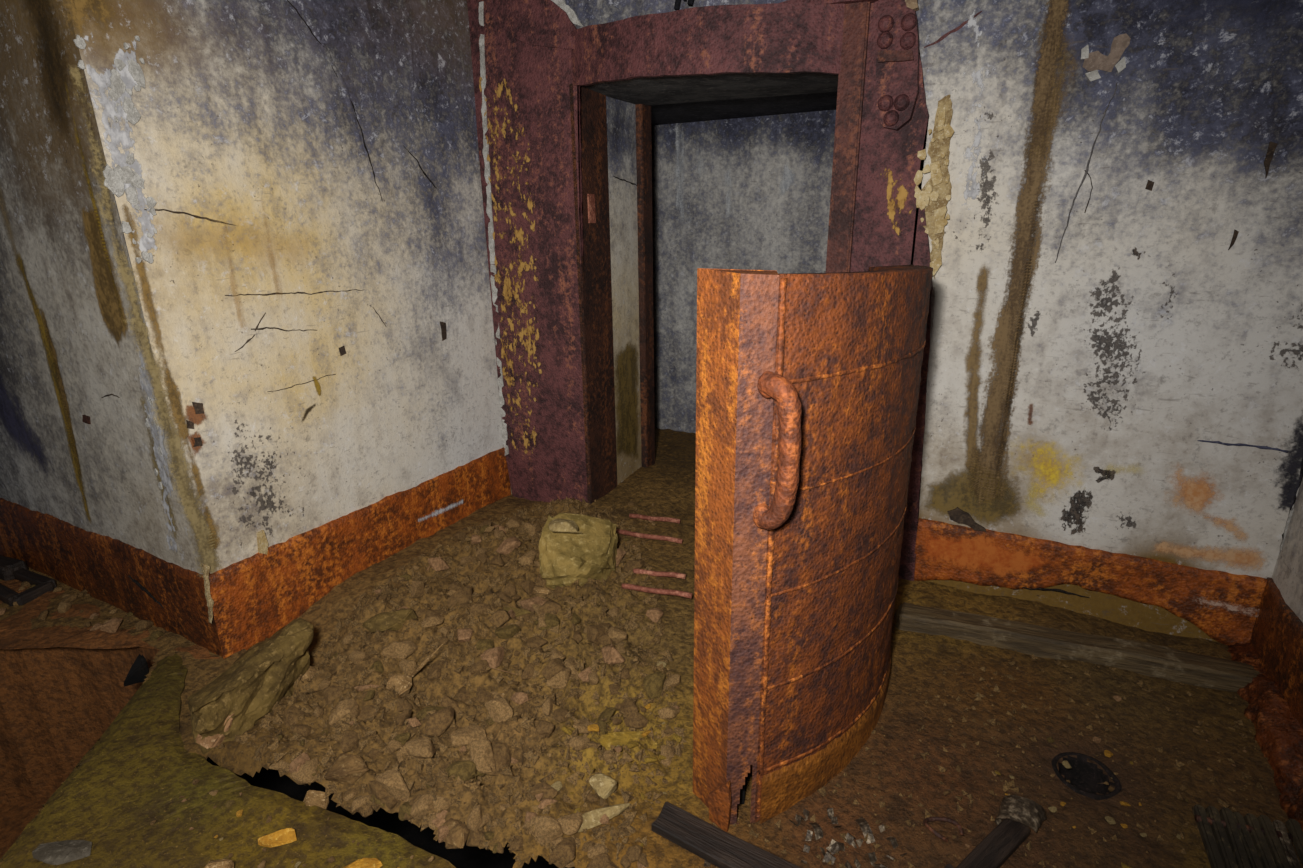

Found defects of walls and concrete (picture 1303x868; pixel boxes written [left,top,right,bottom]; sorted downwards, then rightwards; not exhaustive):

peeling [967,10,982,47]
peeling [73,35,158,264]
flaking render [885,67,989,278]
damp [970,151,998,252]
damp [25,0,220,573]
damp [1028,311,1040,337]
damp [1080,267,1143,430]
damp [213,412,305,545]